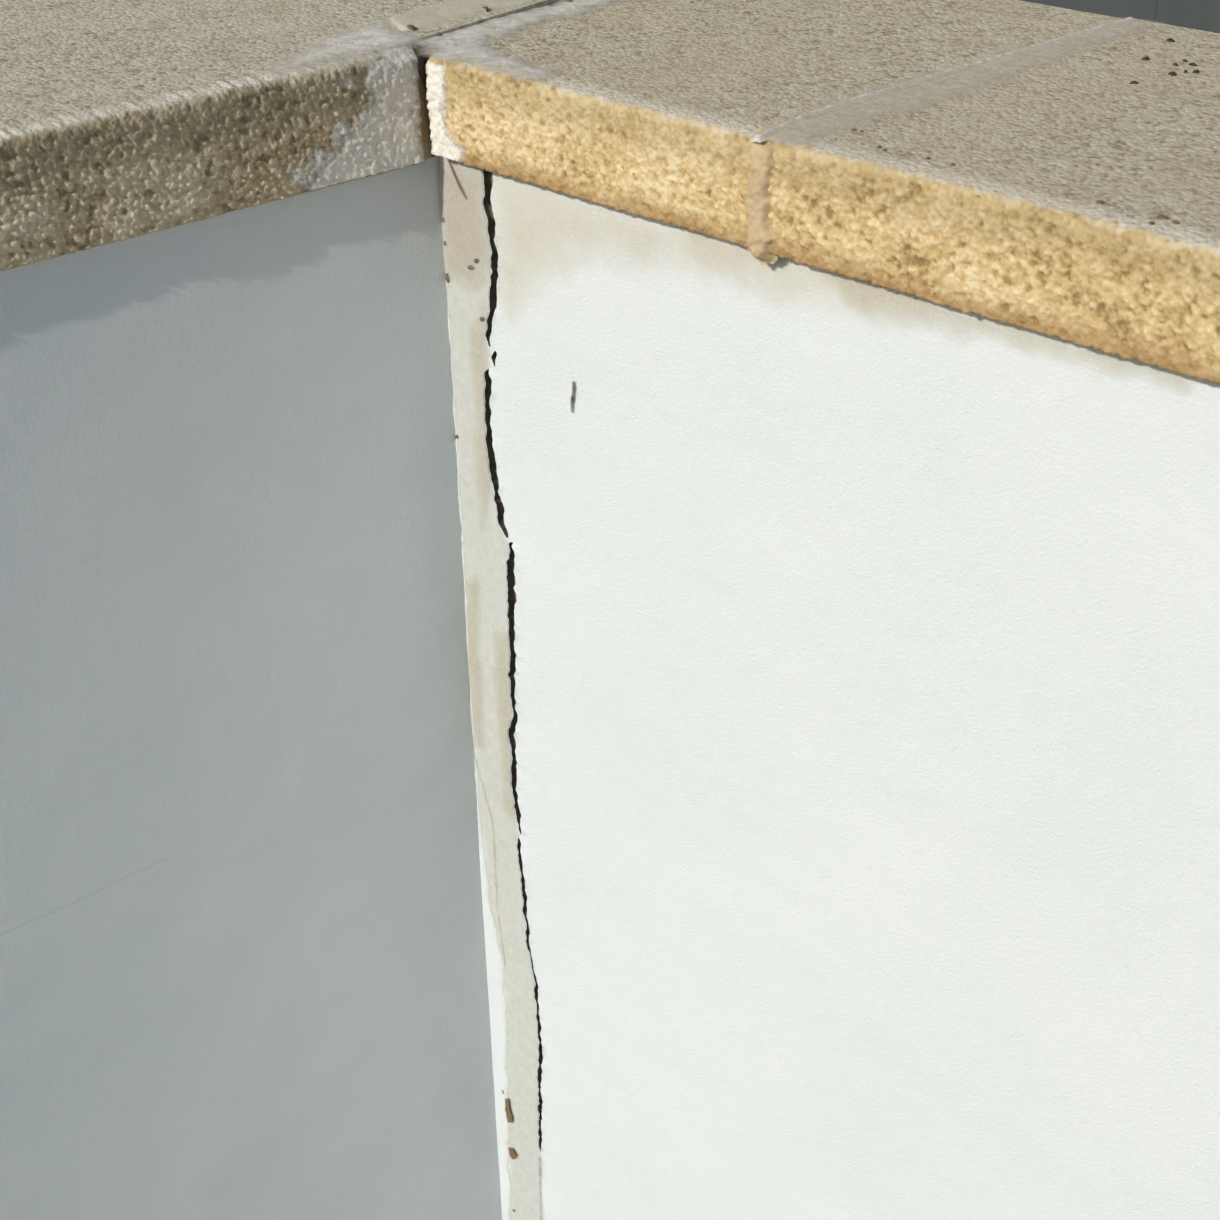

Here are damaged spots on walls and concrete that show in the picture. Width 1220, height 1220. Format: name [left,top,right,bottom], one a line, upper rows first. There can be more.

crack [449,161,543,1206]